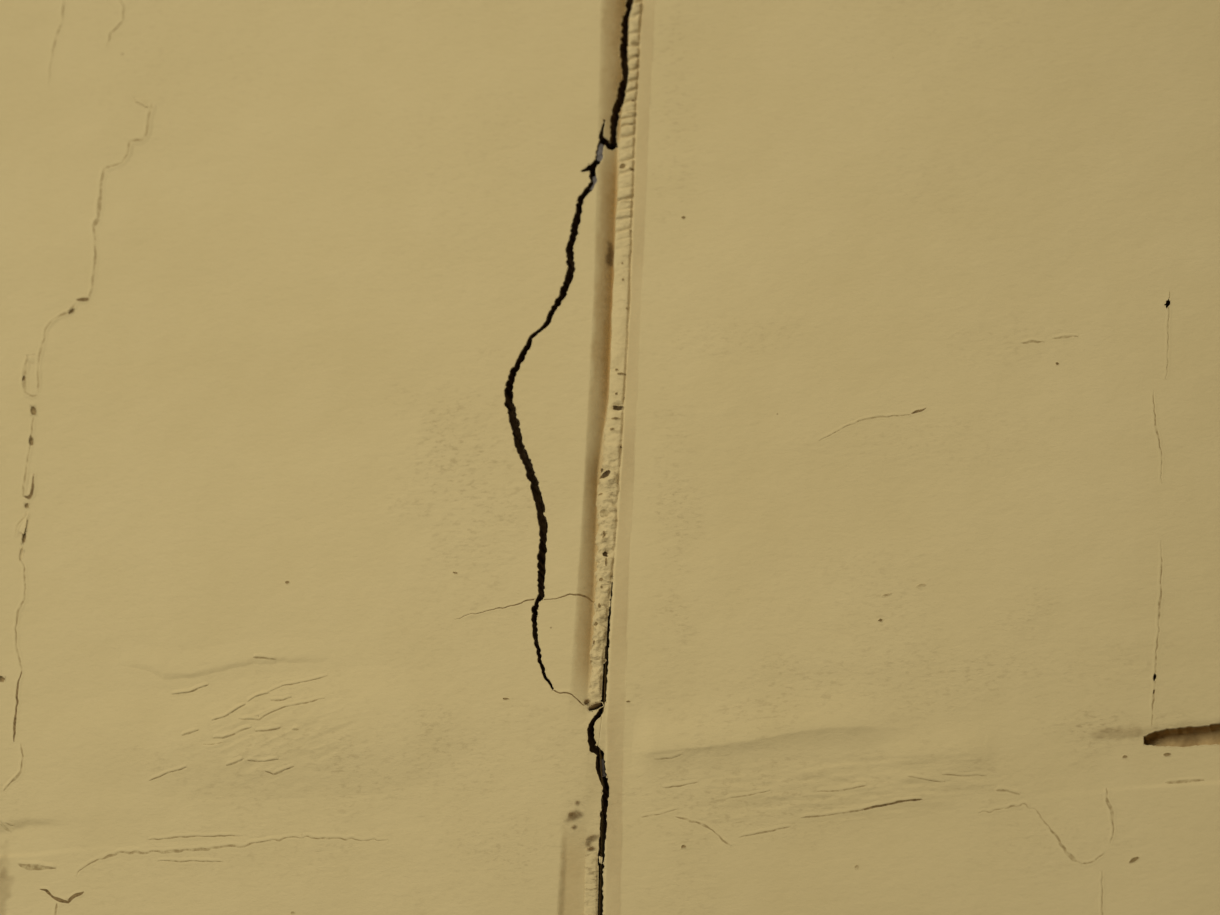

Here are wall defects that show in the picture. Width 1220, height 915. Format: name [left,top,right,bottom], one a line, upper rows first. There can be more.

crack [2,97,157,792]
crack [454,0,633,915]